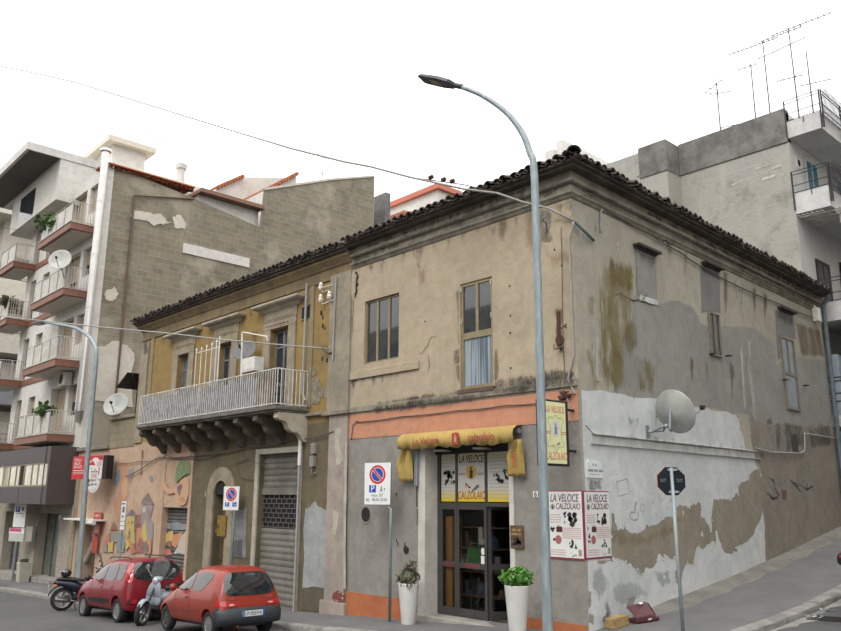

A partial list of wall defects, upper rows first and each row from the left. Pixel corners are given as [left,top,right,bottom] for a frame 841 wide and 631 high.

peeling [131,210,186,229]
peeling [104,287,118,301]
peeling [95,341,135,407]
peeling [597,469,787,583]